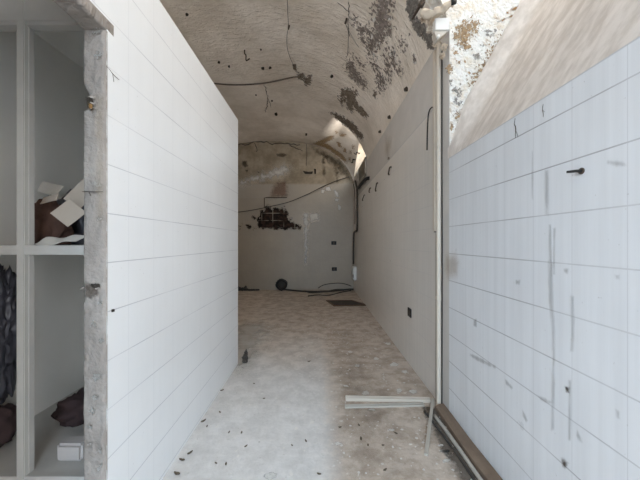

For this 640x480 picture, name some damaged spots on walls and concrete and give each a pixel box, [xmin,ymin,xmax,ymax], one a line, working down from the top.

flaking render [328,0,434,141]
leakage [313,131,353,180]
flaking render [240,206,301,230]